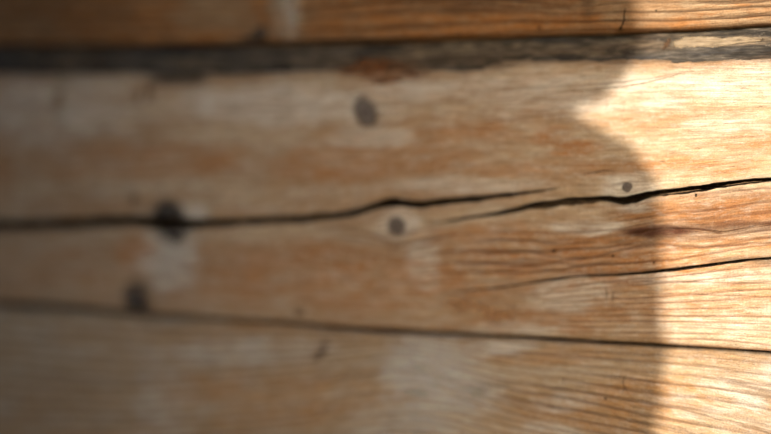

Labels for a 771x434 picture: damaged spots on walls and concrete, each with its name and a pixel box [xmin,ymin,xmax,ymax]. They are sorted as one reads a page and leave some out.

crack [0,177,771,231]
crack [456,257,771,302]